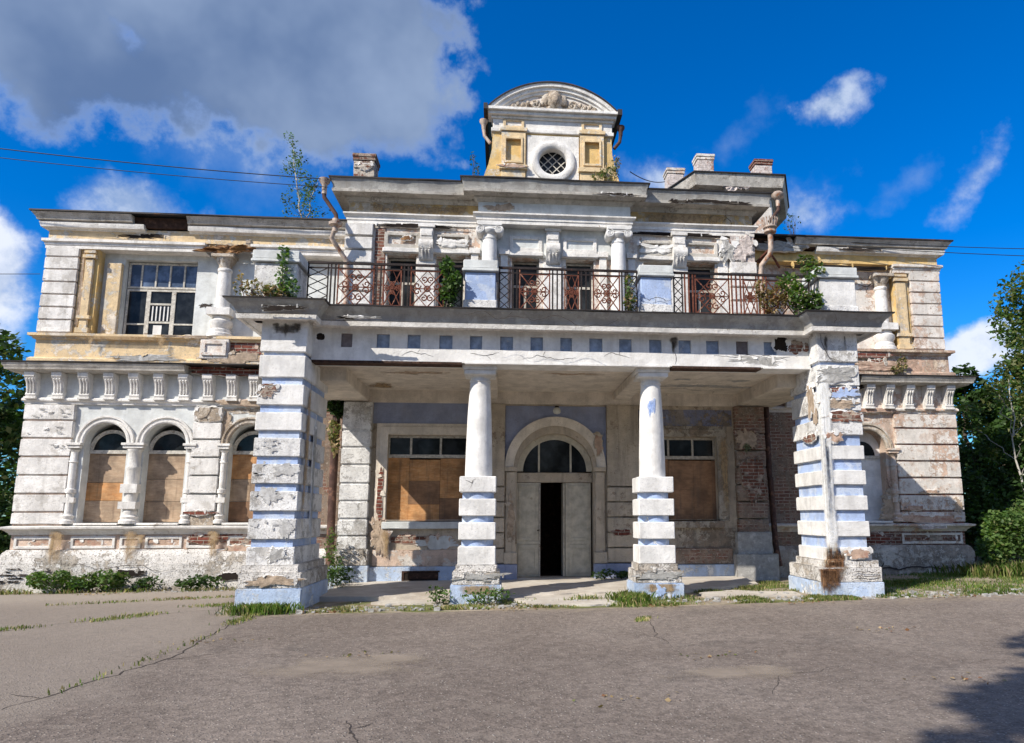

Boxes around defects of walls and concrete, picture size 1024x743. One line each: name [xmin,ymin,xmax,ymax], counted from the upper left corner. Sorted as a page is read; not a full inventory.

flaking render [192,239,257,254]
flaking render [104,352,185,362]
flaking render [207,343,263,368]
peeling [728,338,809,367]
flaking render [193,383,280,437]
flaking render [802,352,904,445]
flaking render [252,415,318,546]
flaking render [368,467,460,559]
flaking render [0,568,51,584]
peeling [144,518,306,588]
corrosion [819,544,845,595]